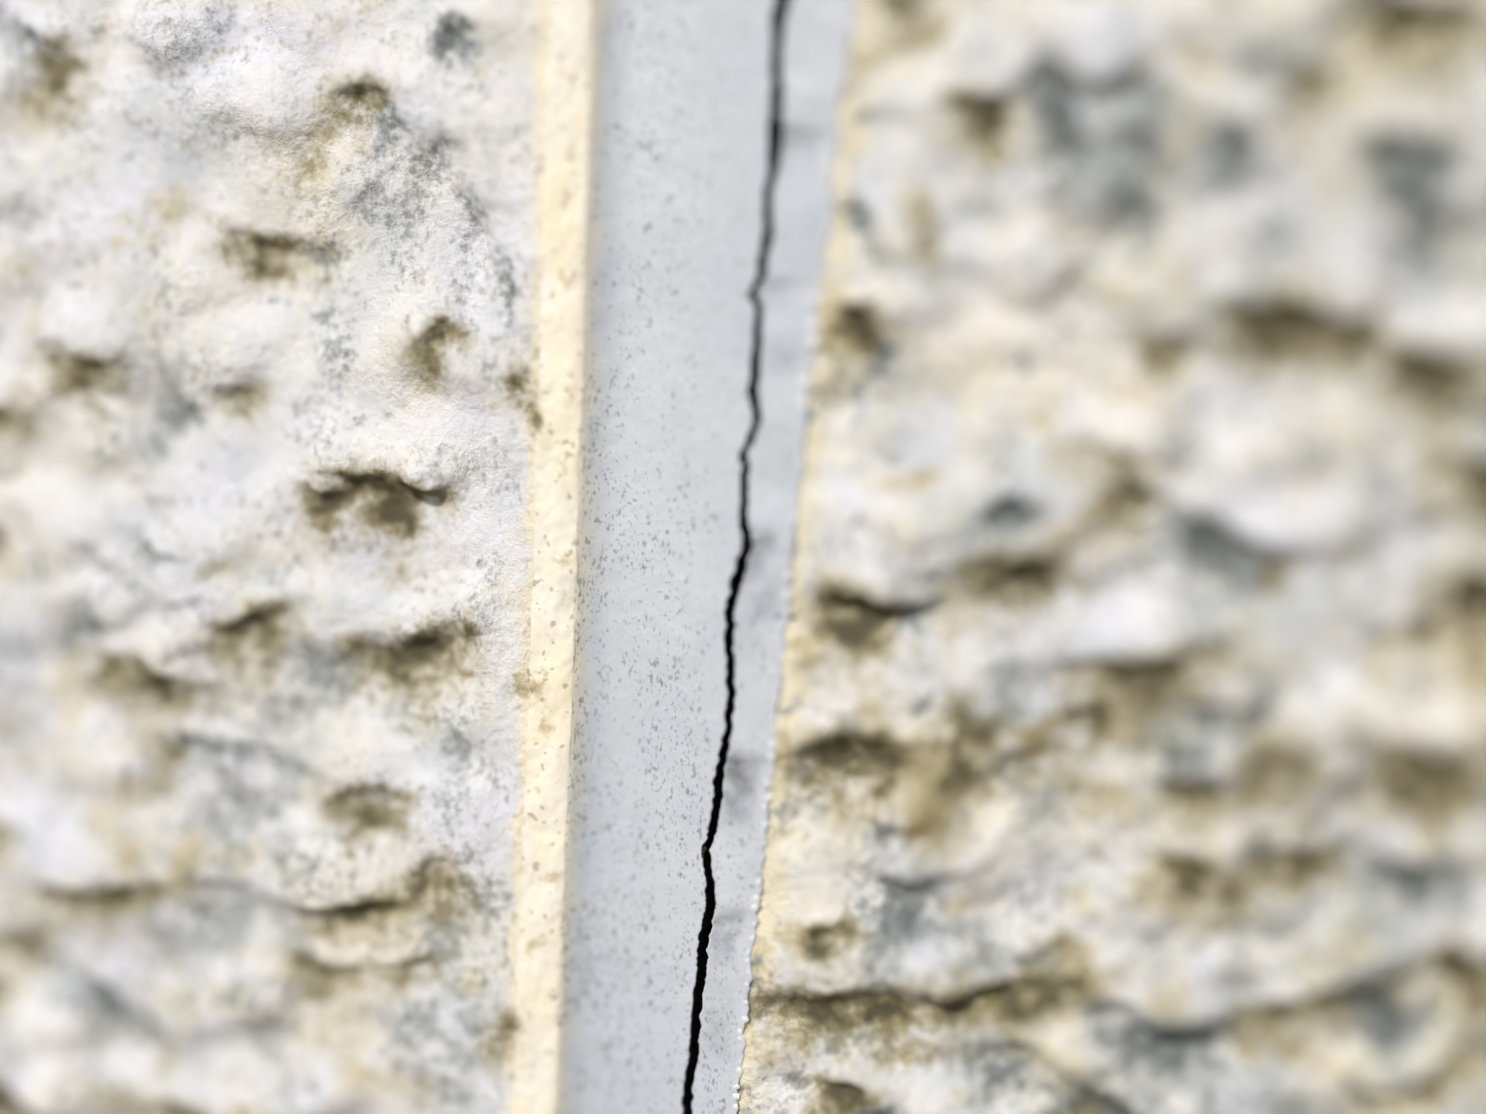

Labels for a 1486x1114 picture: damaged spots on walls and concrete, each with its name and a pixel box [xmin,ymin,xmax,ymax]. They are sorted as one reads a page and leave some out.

crack [682,0,792,1114]